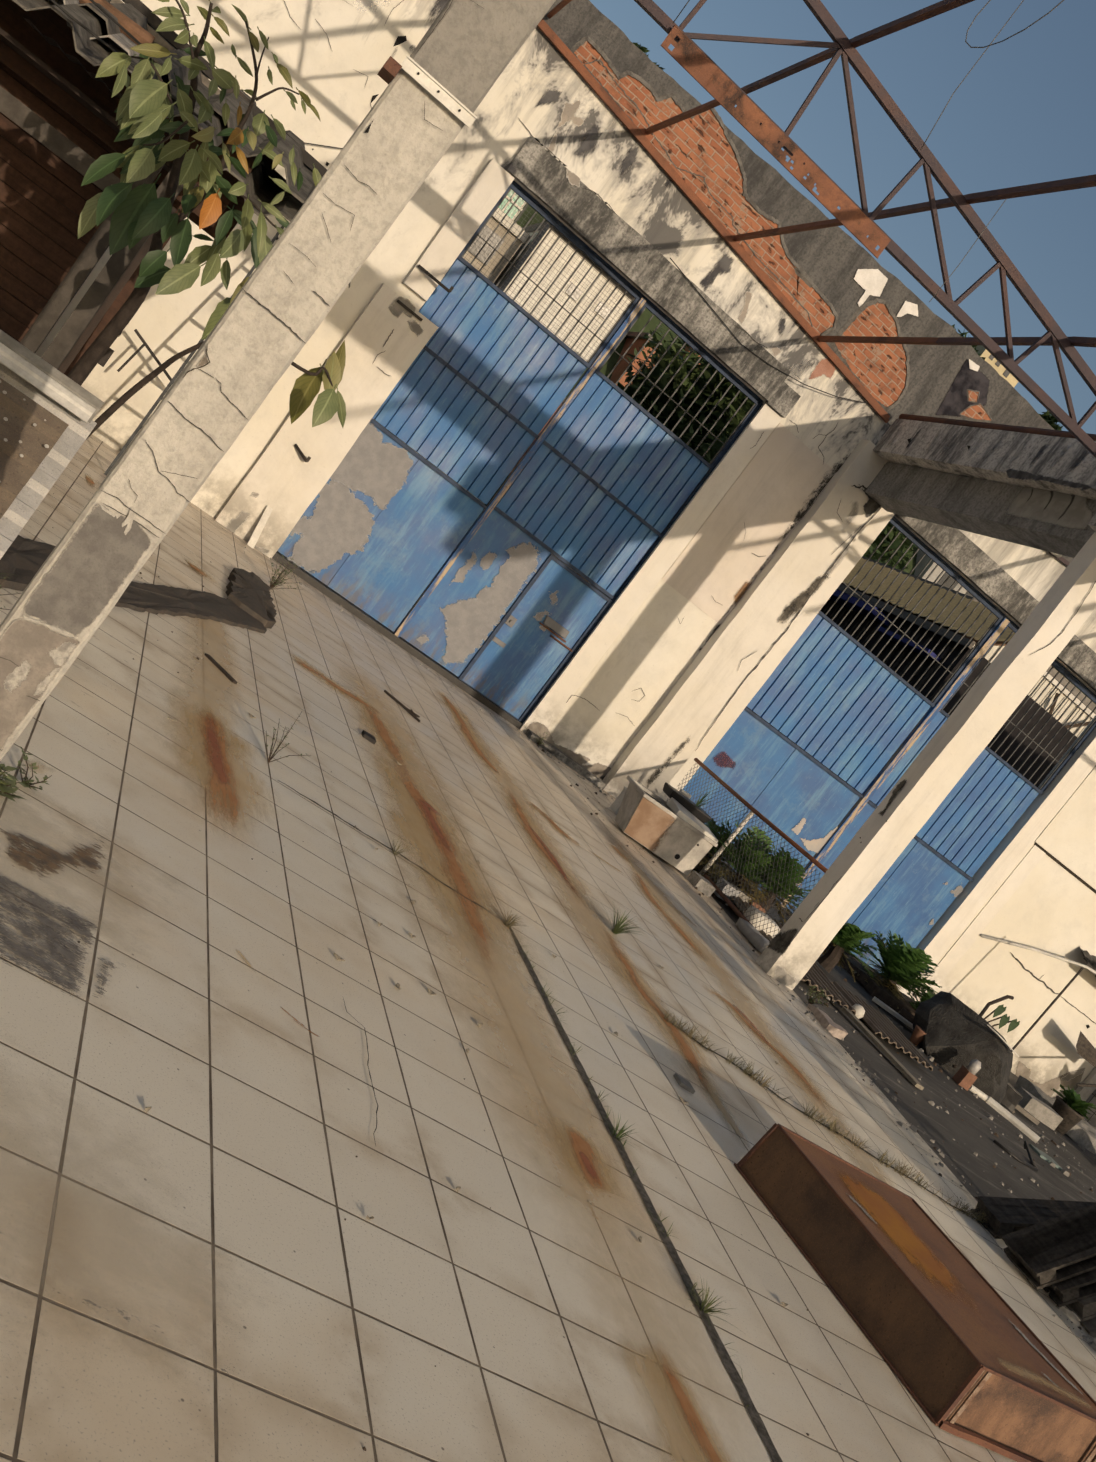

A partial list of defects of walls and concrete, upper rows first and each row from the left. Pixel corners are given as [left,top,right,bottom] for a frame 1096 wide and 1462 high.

water stain [429,0,449,21]
water stain [536,90,562,106]
water stain [574,125,602,157]
water stain [621,146,639,174]
flaking render [570,36,918,411]
peeling [225,492,259,534]
peeling [287,422,414,573]
peeling [416,542,541,666]
rust [189,619,251,819]
rust [296,659,487,944]
rust [596,846,877,1173]
rust [639,1361,723,1462]